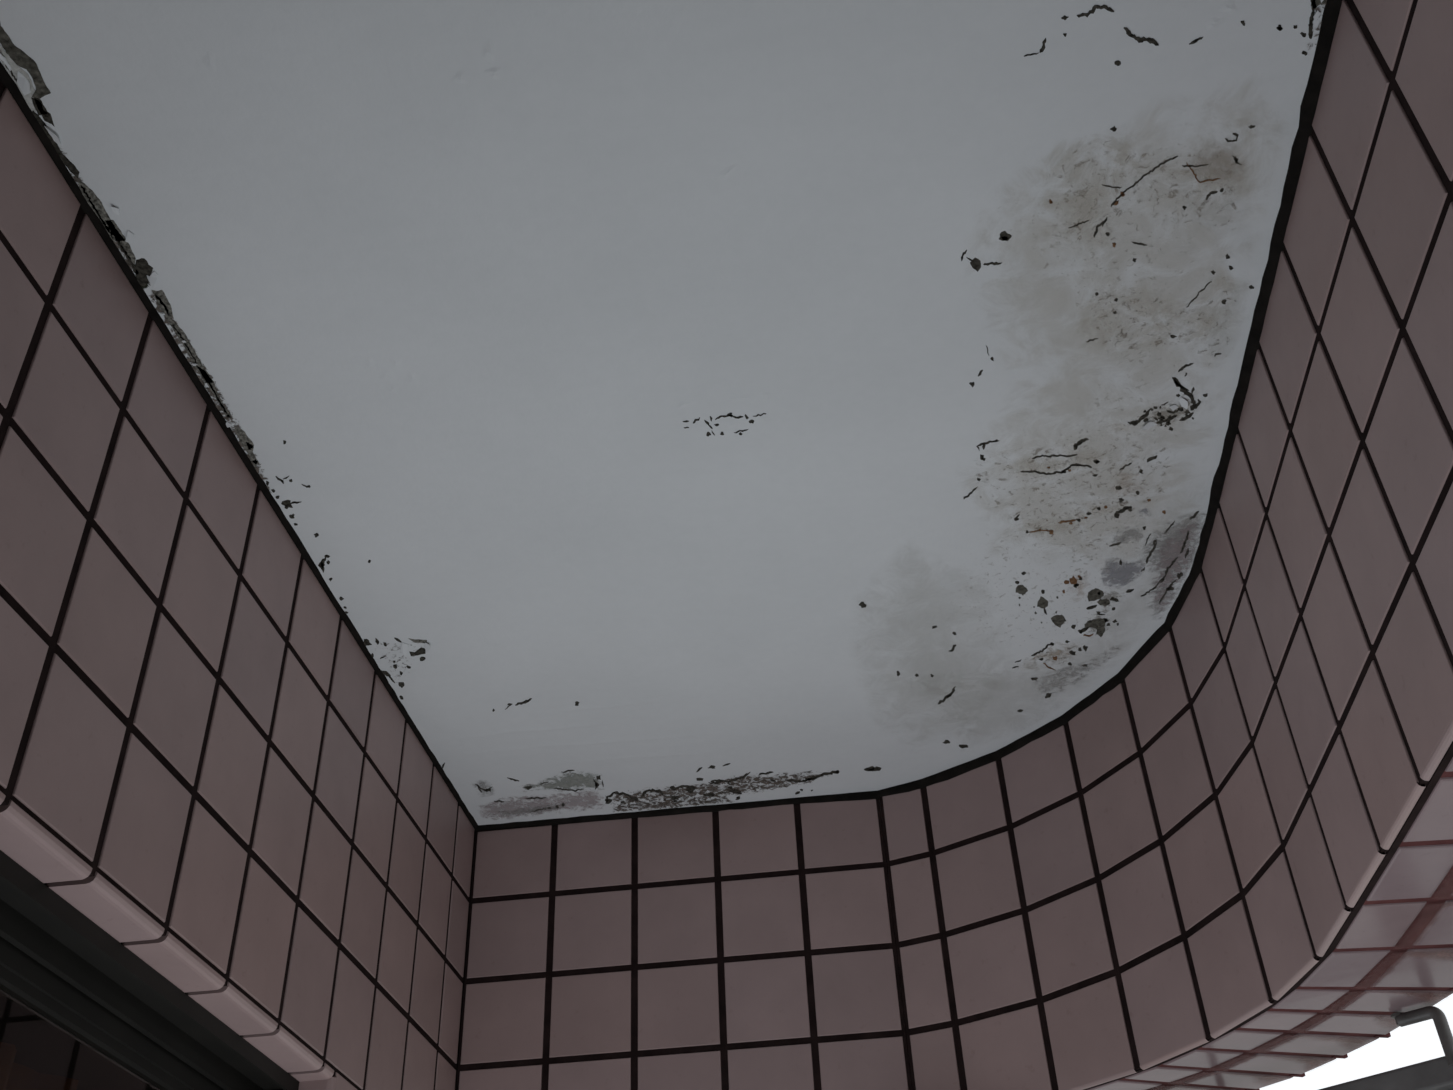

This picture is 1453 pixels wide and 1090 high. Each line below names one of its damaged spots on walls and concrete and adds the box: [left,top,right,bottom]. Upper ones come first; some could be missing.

spalling [0,24,269,490]
leakage [1015,509,1199,637]
peeling [364,637,430,700]
spalling [605,763,839,812]